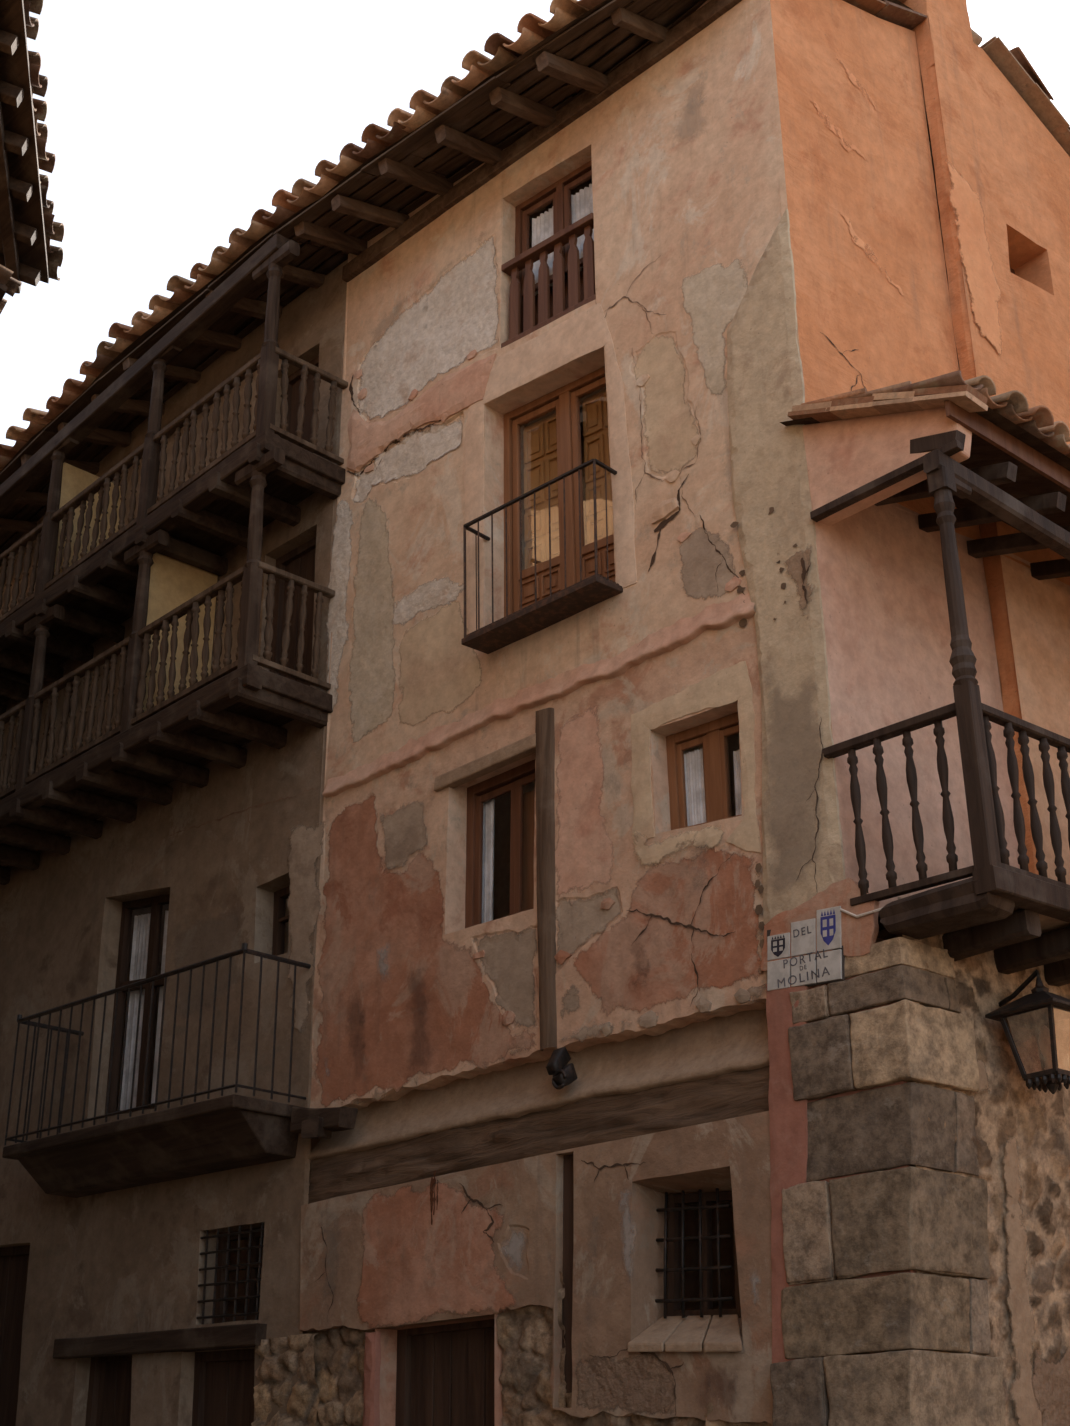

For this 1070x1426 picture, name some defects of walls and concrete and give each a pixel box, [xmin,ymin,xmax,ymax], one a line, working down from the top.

flaking render [354,238,499,419]
crack [594,255,745,595]
flaking render [326,413,464,710]
flaking render [677,521,747,627]
peeling [555,705,614,896]
peeling [287,795,537,1107]
peeling [561,826,765,1041]
crack [626,854,736,1006]
crack [459,1183,503,1242]